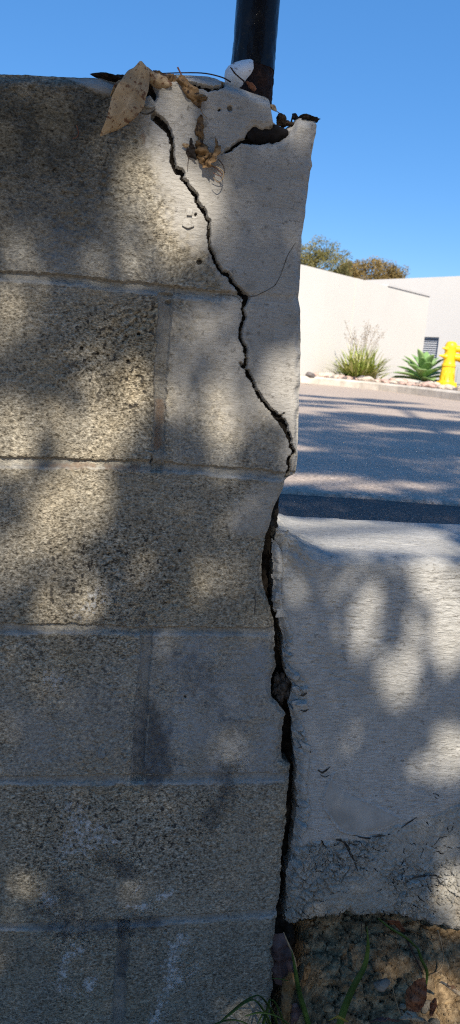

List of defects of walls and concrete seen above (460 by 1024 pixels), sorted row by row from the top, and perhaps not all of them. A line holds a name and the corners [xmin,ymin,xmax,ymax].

crack [140,109,460,951]
crack [270,974,279,999]